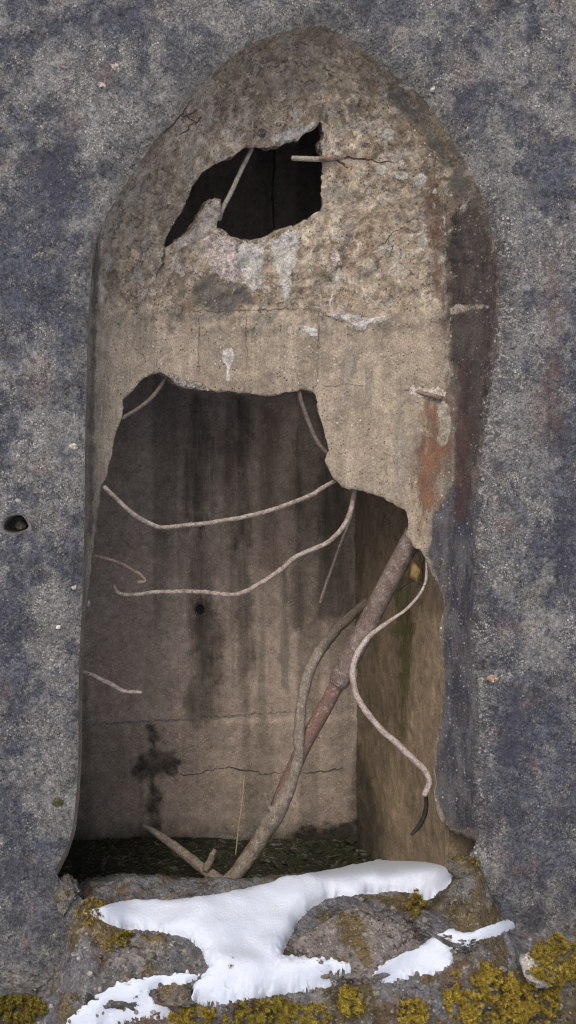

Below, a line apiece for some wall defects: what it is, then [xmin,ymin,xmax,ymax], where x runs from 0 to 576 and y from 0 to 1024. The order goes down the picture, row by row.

crack [161,101,201,136]
spalling [174,200,221,249]
peeling [299,326,319,337]
spalling [168,373,210,391]
peeling [409,360,452,447]
corrosion [411,390,467,520]
damp [388,83,498,828]
damp [280,570,303,688]
damp [132,725,181,839]
crack [180,766,342,776]